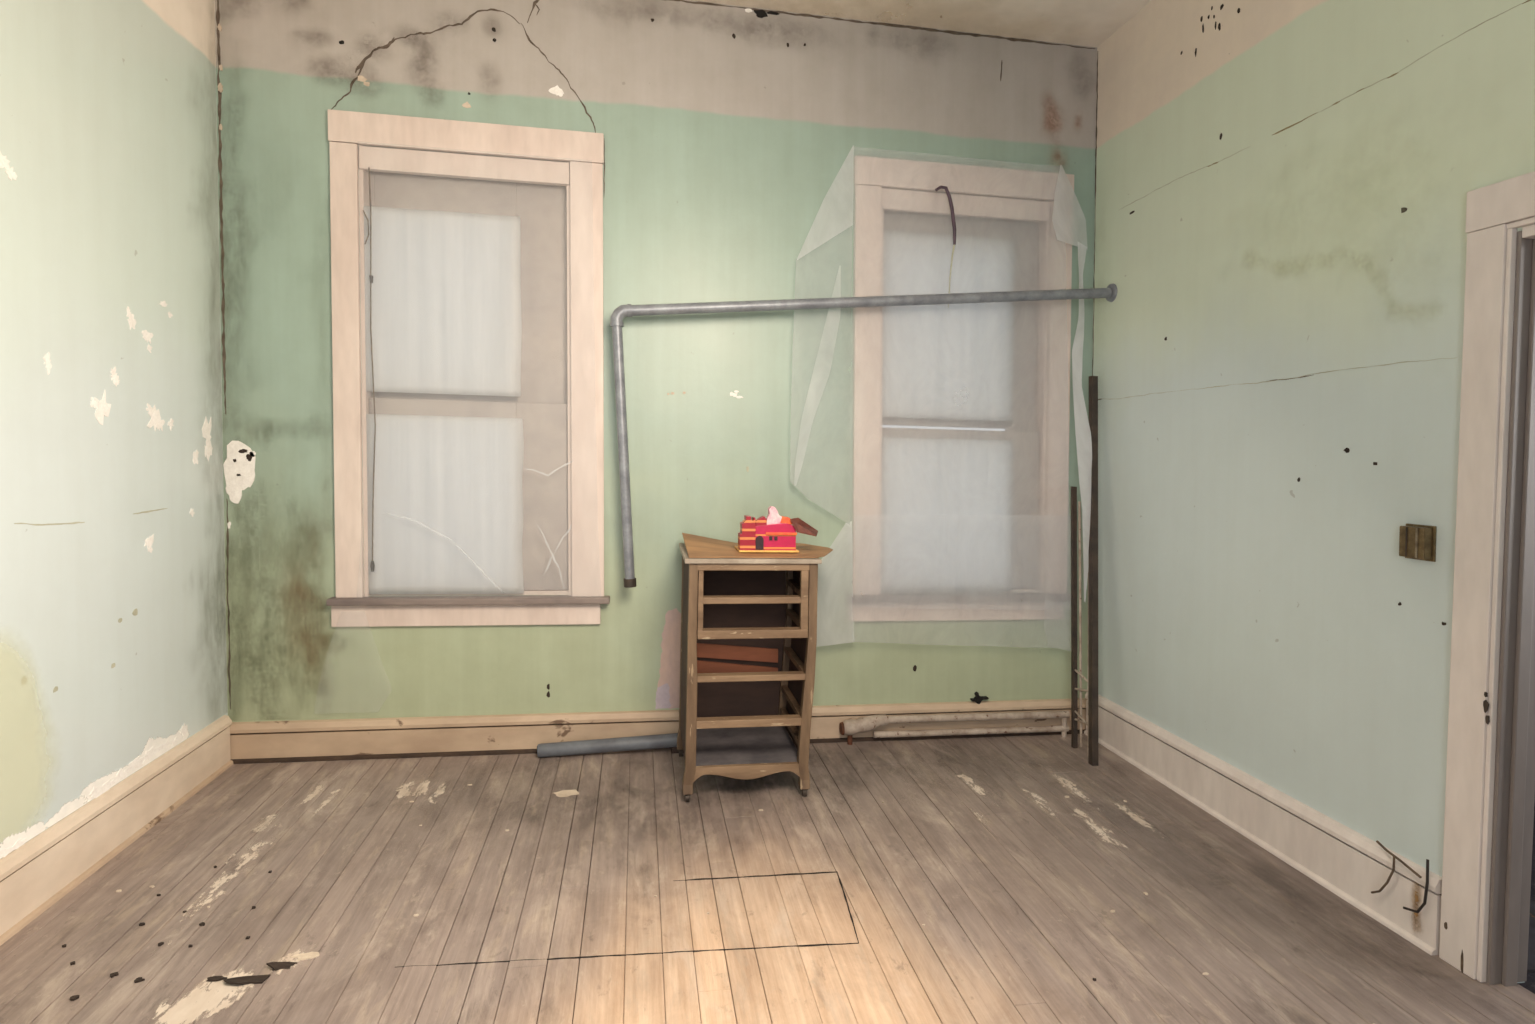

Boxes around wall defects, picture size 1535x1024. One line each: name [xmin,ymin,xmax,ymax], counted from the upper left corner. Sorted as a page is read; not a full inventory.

crack [331,0,596,133]
crack [216,0,226,414]
crack [669,0,1531,400]
peeling [126,306,153,353]
peeling [90,367,120,425]
peeling [146,403,174,431]
peeling [193,417,256,504]
crack [224,499,232,709]
peeling [89,723,188,798]